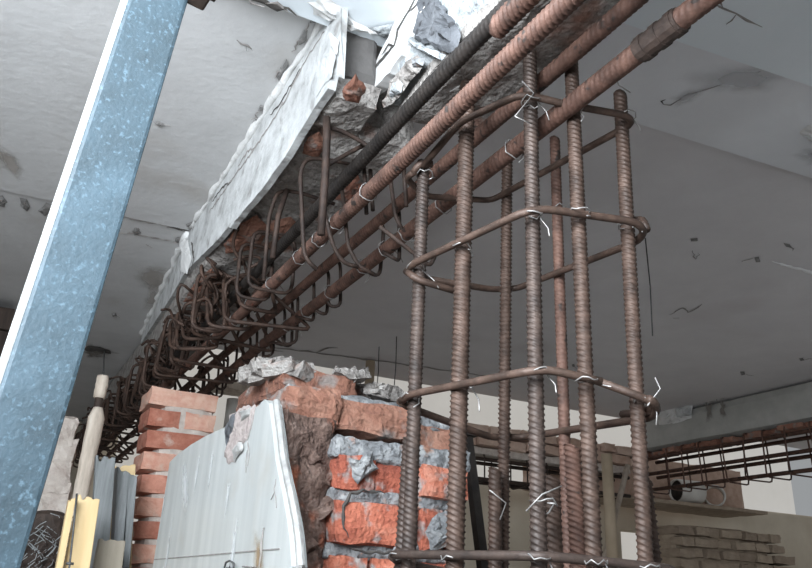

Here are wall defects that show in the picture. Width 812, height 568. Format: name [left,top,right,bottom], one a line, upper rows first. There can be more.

peeling [275,0,394,97]
spalling [382,0,461,108]
flaking render [342,74,366,103]
crack [661,84,722,106]
flaking render [335,175,363,203]
flaking render [223,214,295,254]
peeling [175,237,221,302]
peeling [224,404,256,464]